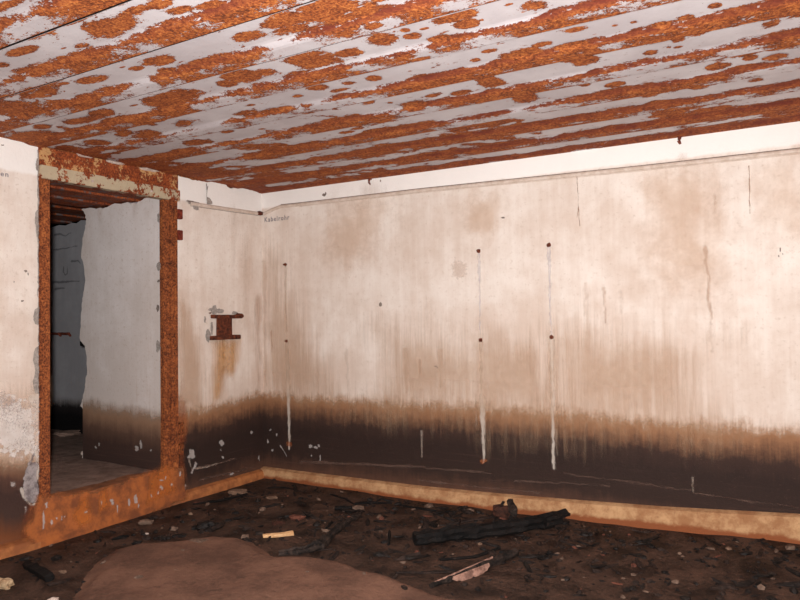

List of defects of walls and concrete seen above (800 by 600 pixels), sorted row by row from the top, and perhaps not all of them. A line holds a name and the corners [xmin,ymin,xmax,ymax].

corrosion [0,0,800,194]
water stain [0,461,39,545]
peeling [20,450,39,505]
water stain [50,402,161,470]
corrosion [26,466,186,548]
water stain [178,339,800,514]